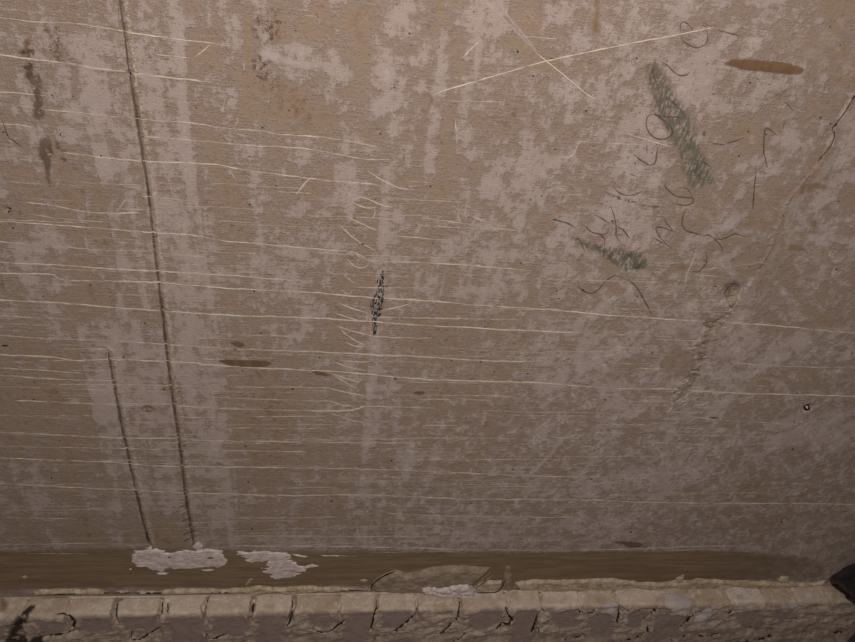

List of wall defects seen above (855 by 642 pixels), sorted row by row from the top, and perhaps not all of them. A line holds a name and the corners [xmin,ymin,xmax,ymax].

water stain [39,138,60,182]
peeling [33,0,371,596]
flaking render [514,574,826,592]
crack [43,594,76,637]
crack [104,592,169,640]
crack [252,593,294,626]
crack [342,571,417,640]
crack [439,582,539,642]
crack [616,605,656,640]
crack [671,611,731,641]